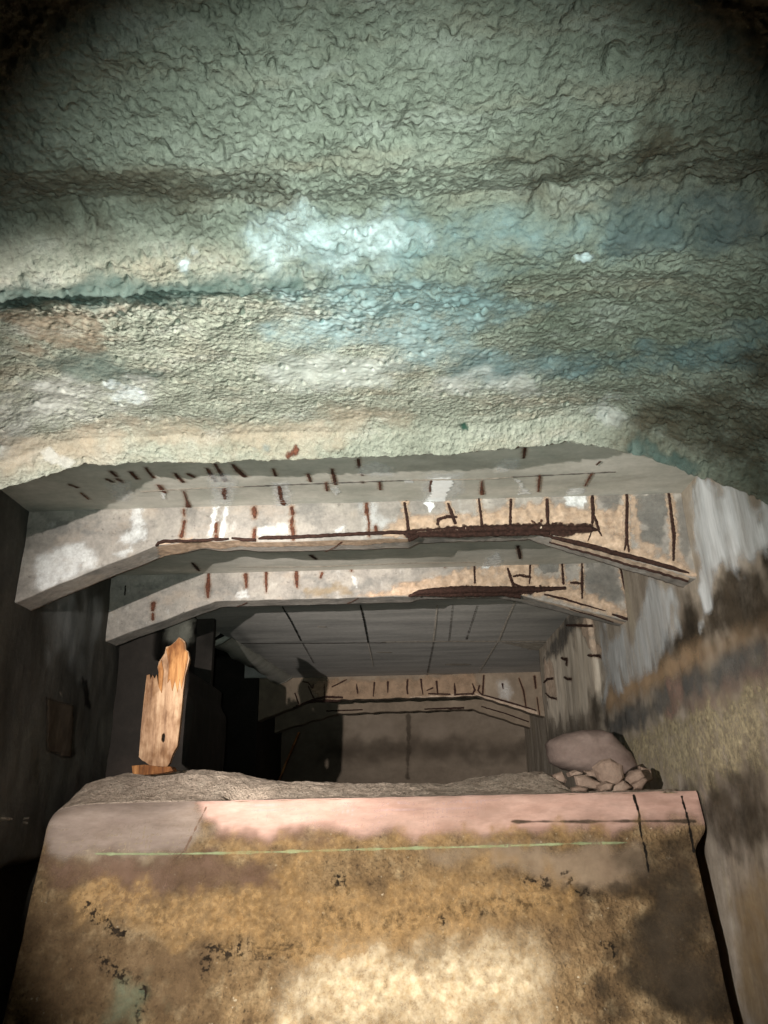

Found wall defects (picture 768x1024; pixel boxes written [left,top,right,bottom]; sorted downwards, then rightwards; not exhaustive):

water stain [299,222,509,361]
water stain [453,349,598,383]
corrosion [106,468,166,493]
corrosion [206,464,247,500]
corrosion [272,469,295,540]
corrosion [405,519,593,538]
corrosion [192,563,210,598]
spalling [155,493,697,658]
water stain [26,392,768,1024]
crack [633,795,649,872]
crack [681,796,695,853]